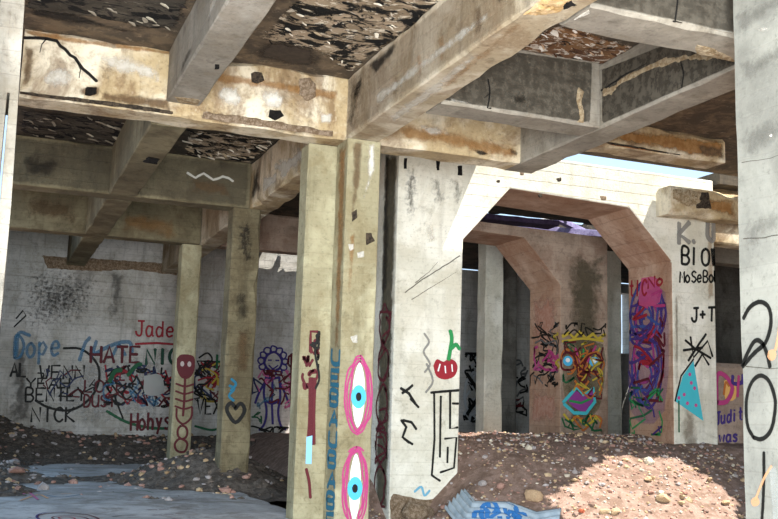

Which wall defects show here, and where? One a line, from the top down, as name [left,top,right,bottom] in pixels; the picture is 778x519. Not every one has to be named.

peeling [25,0,187,31]
spalling [523,0,576,15]
peeling [258,0,439,71]
peeling [523,10,632,65]
crack [23,36,98,82]
peeling [20,110,125,145]
spalling [20,87,173,114]
spalling [175,97,333,137]
peeling [182,130,273,163]